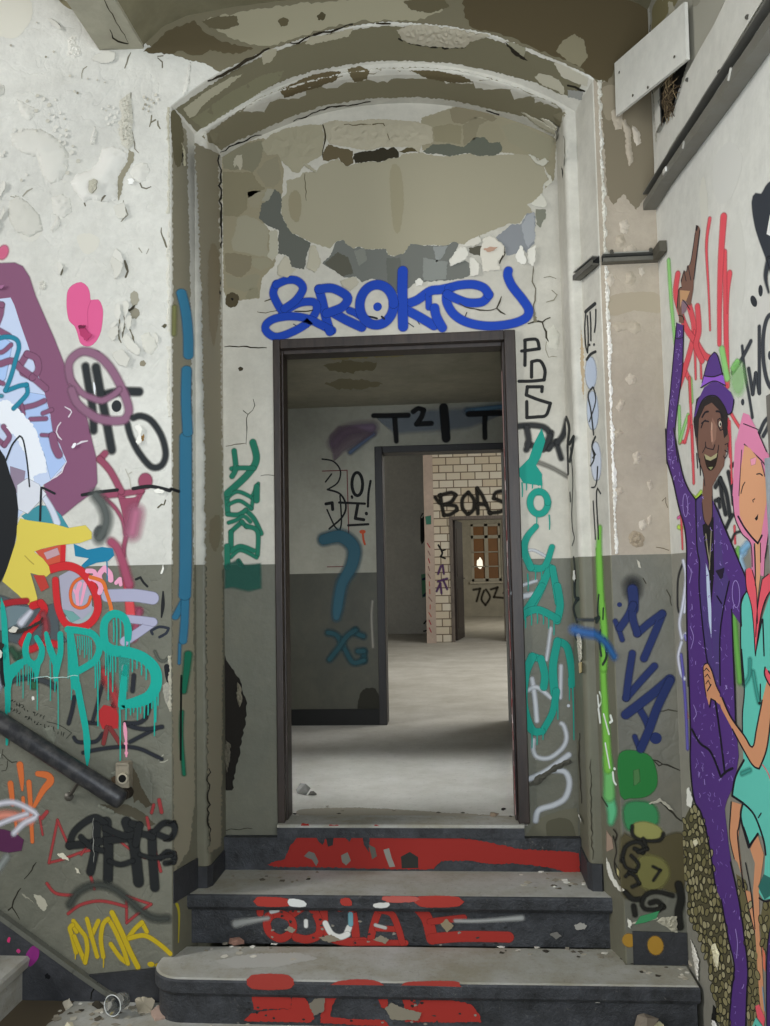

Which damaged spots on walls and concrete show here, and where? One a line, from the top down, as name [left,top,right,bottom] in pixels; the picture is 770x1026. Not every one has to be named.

peeling [91,50,115,63]
flaking render [305,28,353,45]
flaking render [397,24,490,48]
flaking render [506,41,527,61]
flaking render [117,93,155,200]
flaking render [88,179,98,193]
flaking render [162,74,242,332]
flaking render [222,107,563,294]
peeling [110,248,123,279]
flaking render [245,287,259,299]
flaking render [535,62,645,568]
peeling [107,301,141,367]